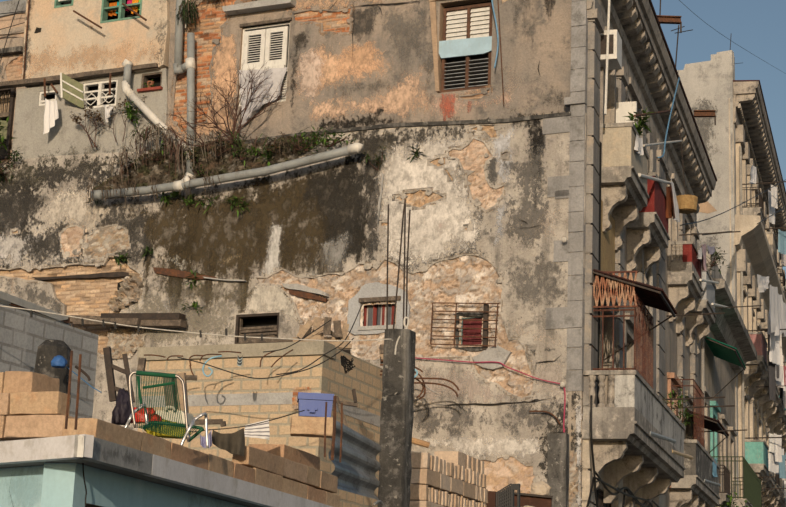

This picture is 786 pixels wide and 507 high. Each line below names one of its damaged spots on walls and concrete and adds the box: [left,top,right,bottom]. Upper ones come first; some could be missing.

spalling [170,0,247,135]
spalling [291,6,354,36]
water stain [351,6,433,68]
water stain [7,279,61,313]
water stain [0,143,134,269]
spalling [0,220,142,359]
water stain [84,107,474,347]
spalling [253,123,537,401]
flaking render [292,387,311,409]